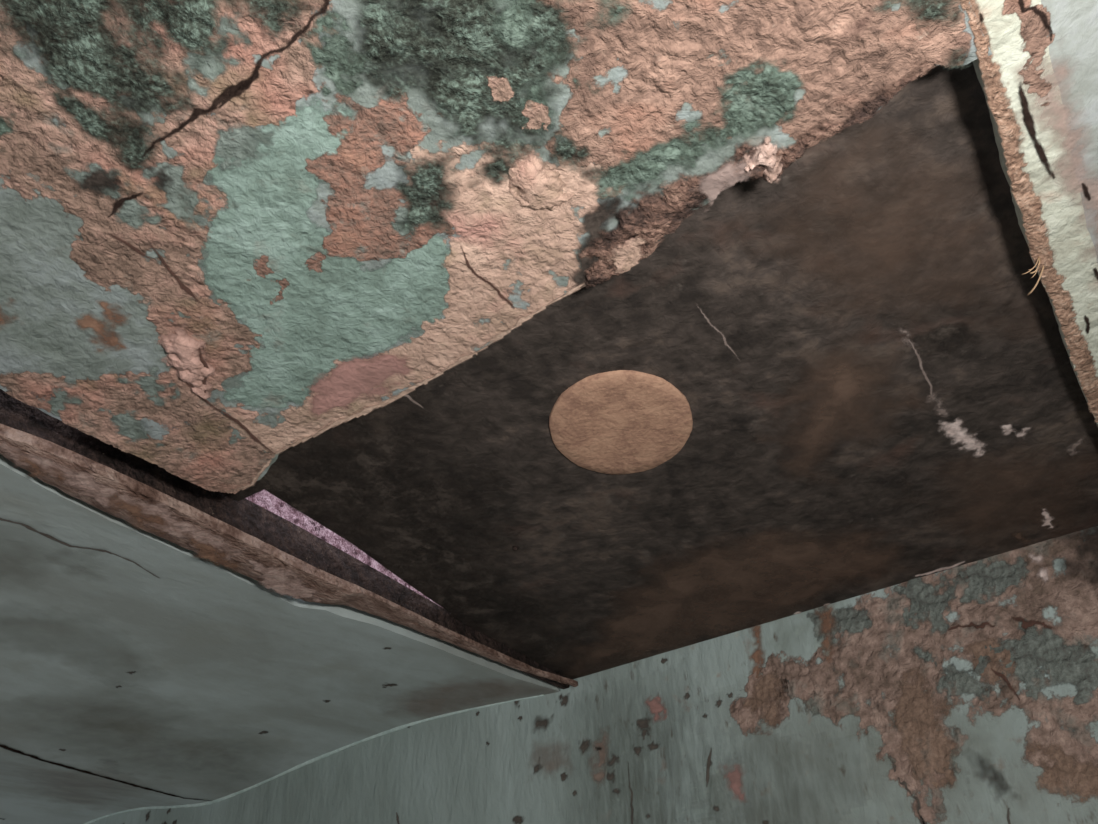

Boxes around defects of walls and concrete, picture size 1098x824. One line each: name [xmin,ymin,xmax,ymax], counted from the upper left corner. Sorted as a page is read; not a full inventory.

crack [143,0,330,157]
crack [1019,84,1055,178]
crack [1082,183,1091,200]
peeling [0,0,1098,494]
crack [1083,315,1091,334]
crack [0,518,159,578]
peeling [727,531,1098,824]
crack [889,756,927,824]